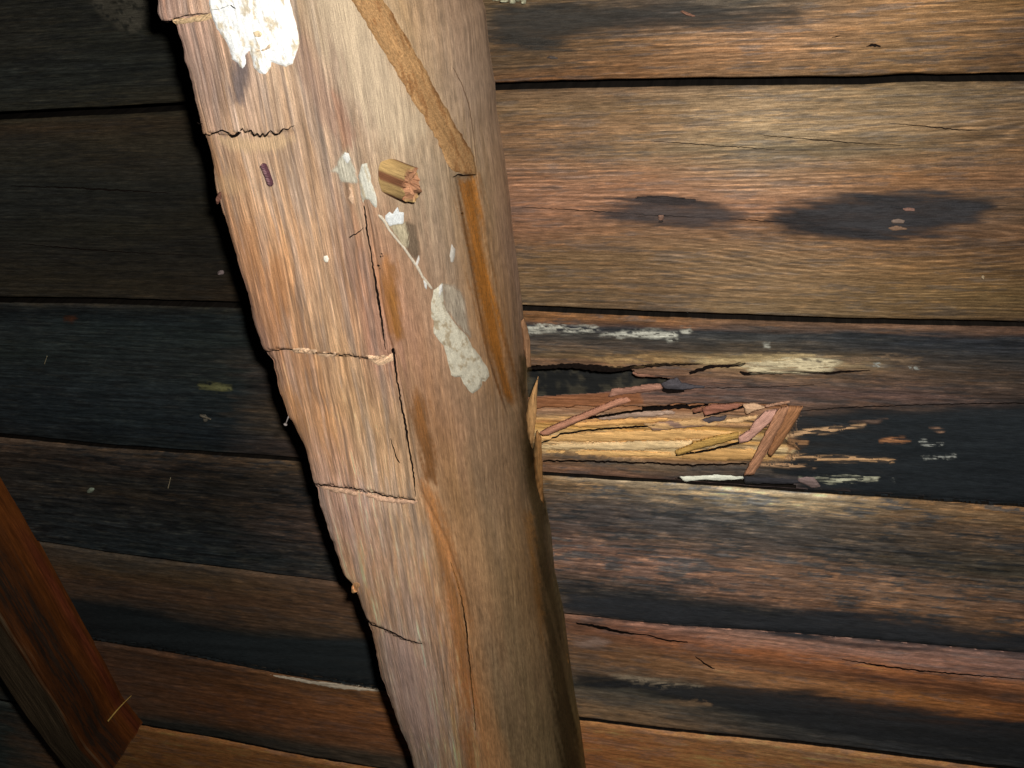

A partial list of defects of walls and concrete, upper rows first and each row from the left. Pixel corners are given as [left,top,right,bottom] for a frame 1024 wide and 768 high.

flaking render [209,0,300,74]
crack [197,122,295,138]
damp [603,197,737,226]
damp [771,191,996,240]
flaking render [333,152,489,393]
crack [272,206,416,500]
spalling [527,365,705,397]
peeling [644,401,790,431]
peeling [680,474,820,488]
crack [451,564,476,730]